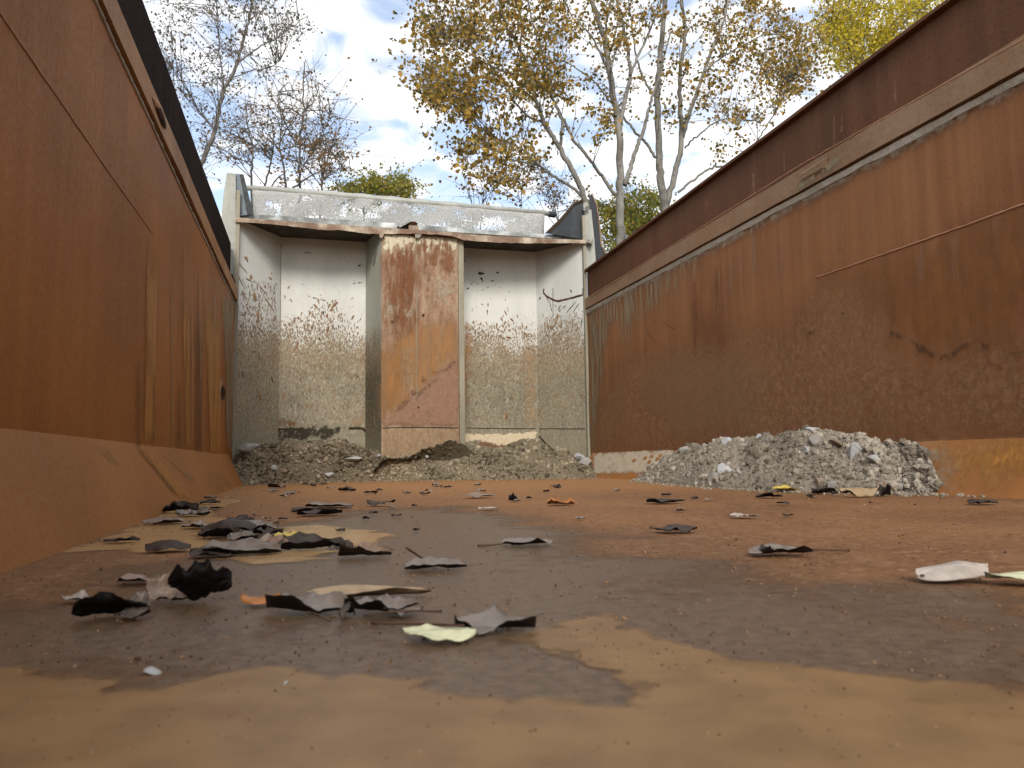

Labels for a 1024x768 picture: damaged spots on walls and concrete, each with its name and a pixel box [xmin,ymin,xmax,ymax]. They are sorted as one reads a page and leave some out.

corrosion [145,262,157,439]
corrosion [206,310,221,454]
corrosion [385,243,453,328]